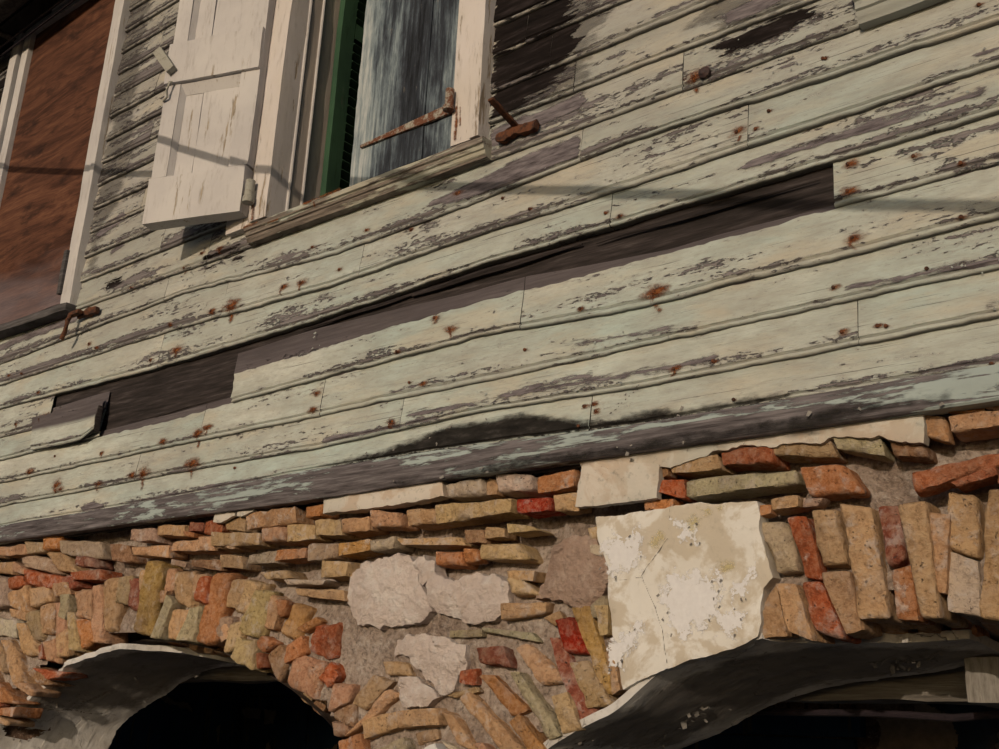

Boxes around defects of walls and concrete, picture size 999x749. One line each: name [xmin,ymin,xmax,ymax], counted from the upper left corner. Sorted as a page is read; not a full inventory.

peeling [710,5,820,60]
peeling [488,0,588,148]
peeling [741,86,986,169]
rust [644,284,669,311]
peeling [0,317,77,351]
peeling [598,522,646,581]
peeling [669,516,700,547]
peeling [655,561,757,643]
peeling [606,613,645,674]
peeling [876,704,959,749]